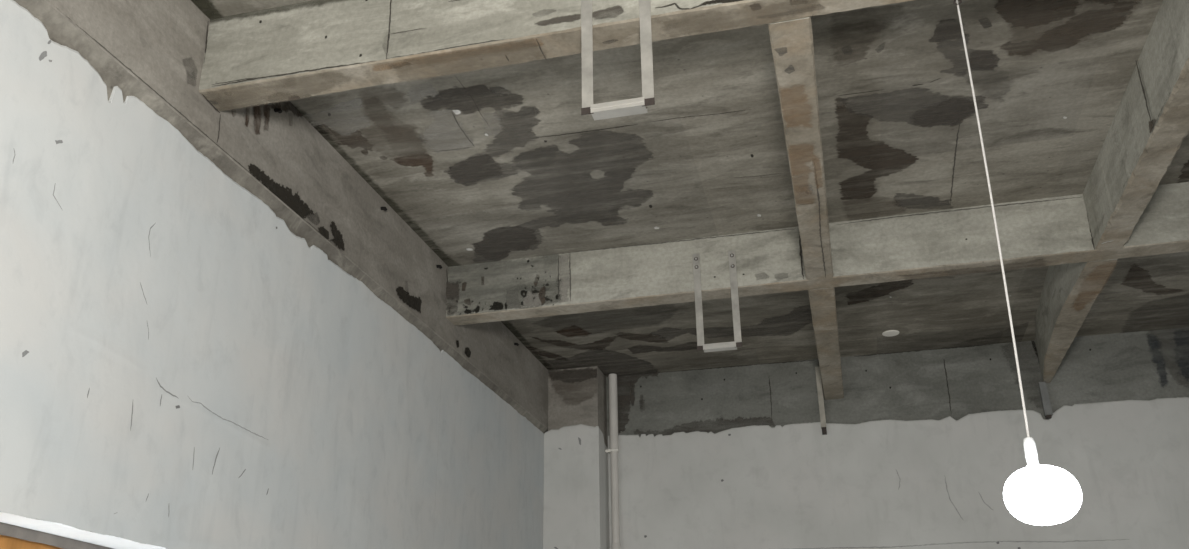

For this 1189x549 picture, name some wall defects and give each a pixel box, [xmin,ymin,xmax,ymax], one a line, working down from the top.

water stain [217,85,460,267]
water stain [422,85,653,305]
water stain [396,287,422,313]
water stain [446,282,812,437]